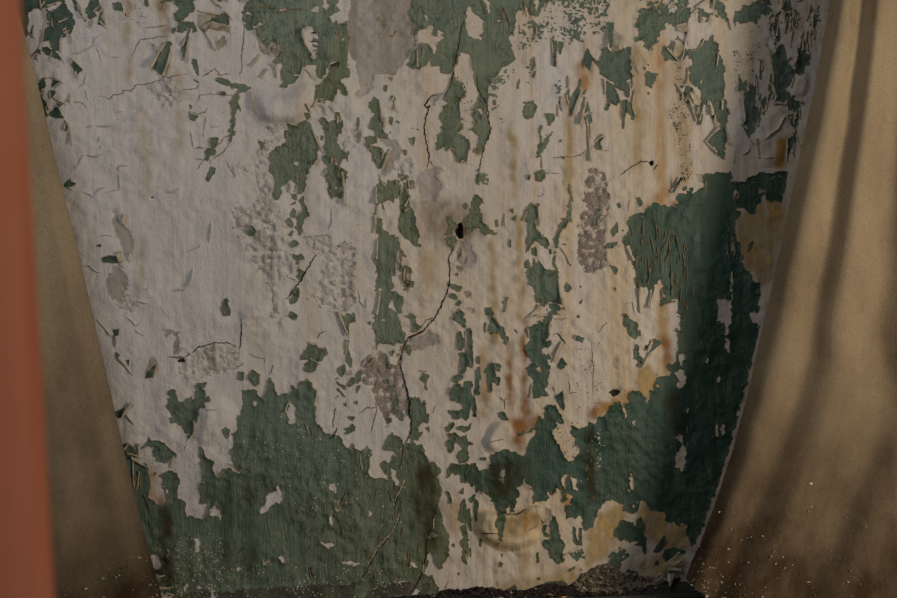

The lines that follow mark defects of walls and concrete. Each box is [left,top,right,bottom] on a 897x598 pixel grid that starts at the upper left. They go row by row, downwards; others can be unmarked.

peeling [21,0,123,145]
crack [424,1,464,167]
crack [477,81,492,181]
peeling [97,320,132,375]
flaking render [96,208,138,313]
peeling [123,0,821,598]
peeling [115,402,134,425]
crack [362,241,457,578]
corrosion [513,398,539,444]